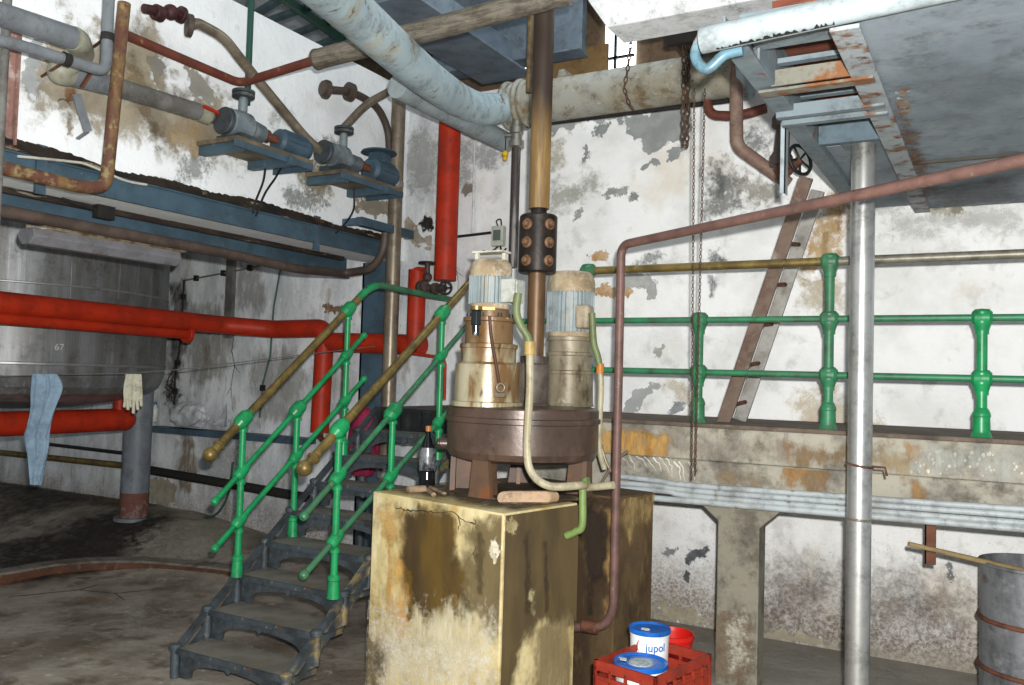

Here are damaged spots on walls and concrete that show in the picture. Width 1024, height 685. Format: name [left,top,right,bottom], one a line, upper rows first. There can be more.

water stain [25,43,108,135]
water stain [124,17,224,110]
water stain [119,98,223,182]
spalling [551,109,692,171]
corrosion [899,108,936,196]
spalling [601,186,639,202]
spalling [595,273,658,300]
corrosion [783,441,847,492]
water stain [0,510,225,580]
water stain [366,504,494,685]
crack [396,507,477,530]
spalling [661,546,710,583]